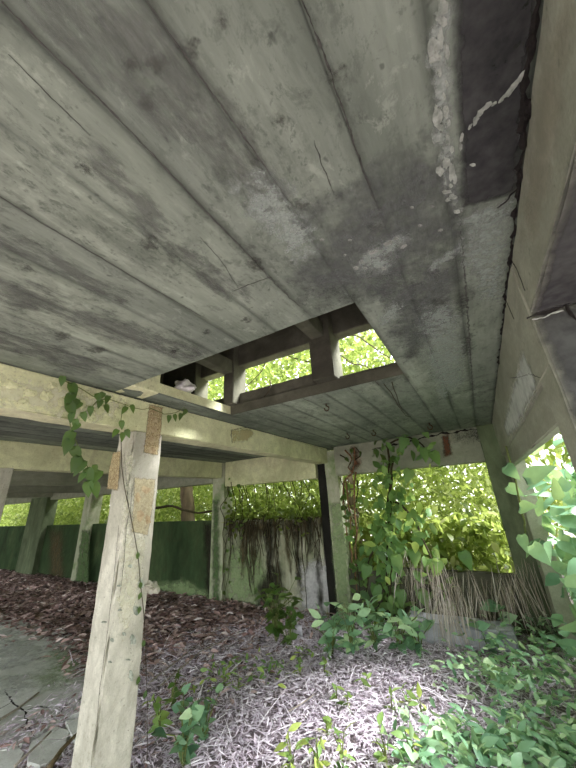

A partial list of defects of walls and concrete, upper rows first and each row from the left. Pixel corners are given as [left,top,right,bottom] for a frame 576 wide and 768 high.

crack [0,0,300,316]
leakage [164,100,323,250]
crack [301,0,375,202]
leakage [299,0,537,397]
peeling [427,0,525,202]
crack [495,0,576,388]
crack [372,429,477,450]
corrosion [442,435,452,457]
crack [0,453,134,740]
leakage [230,517,331,614]